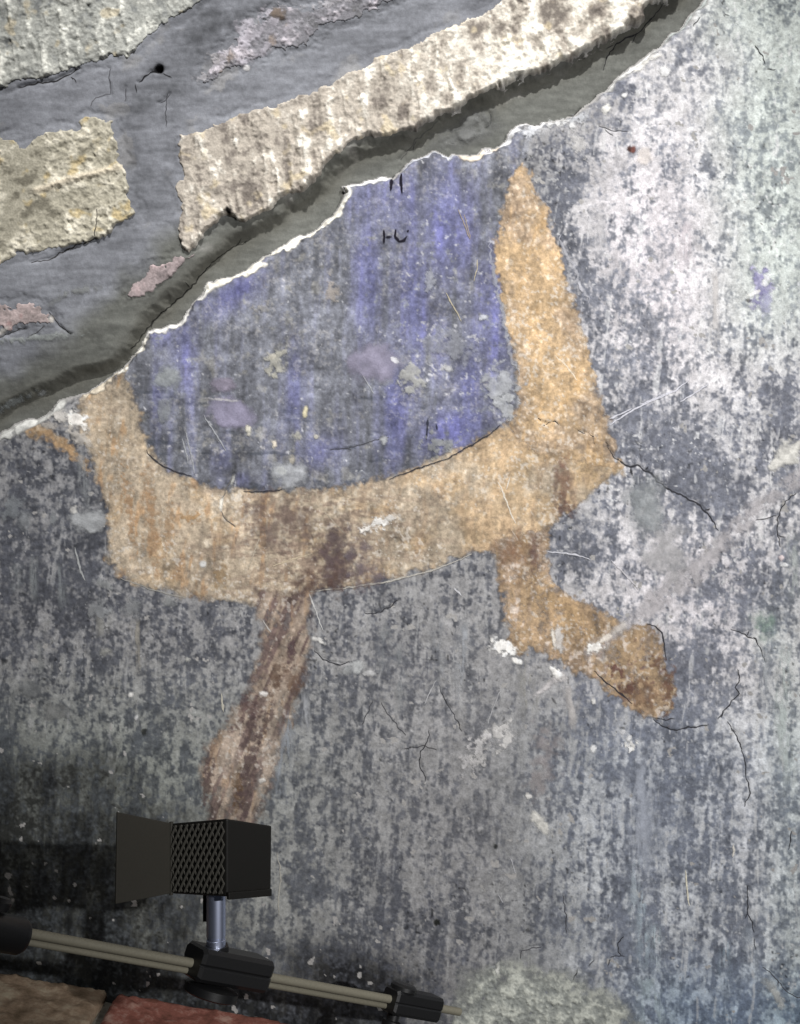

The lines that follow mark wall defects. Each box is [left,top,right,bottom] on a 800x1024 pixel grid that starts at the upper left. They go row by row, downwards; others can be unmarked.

spalling [211,0,350,75]
spalling [608,51,671,97]
spalling [402,113,586,172]
spalling [198,177,390,300]
spalling [0,400,91,447]
spalling [84,310,190,398]
spalling [264,350,286,378]
spalling [391,357,425,393]
spalling [482,361,527,423]
crack [538,418,718,530]
crack [362,701,436,781]
crack [653,670,751,806]